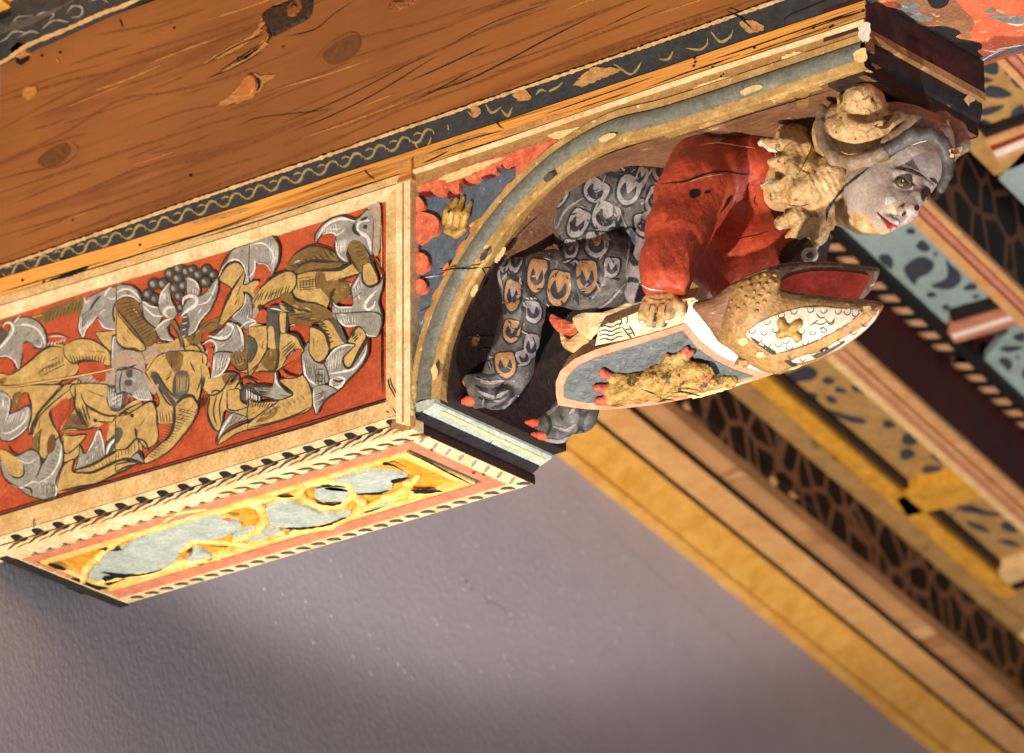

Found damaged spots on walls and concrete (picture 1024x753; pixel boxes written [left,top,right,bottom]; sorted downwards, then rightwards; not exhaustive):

peeling [740,20,765,33]
crack [205,2,352,79]
peeling [853,22,897,69]
peeling [573,67,621,87]
peeling [512,90,531,101]
crack [419,267,486,278]